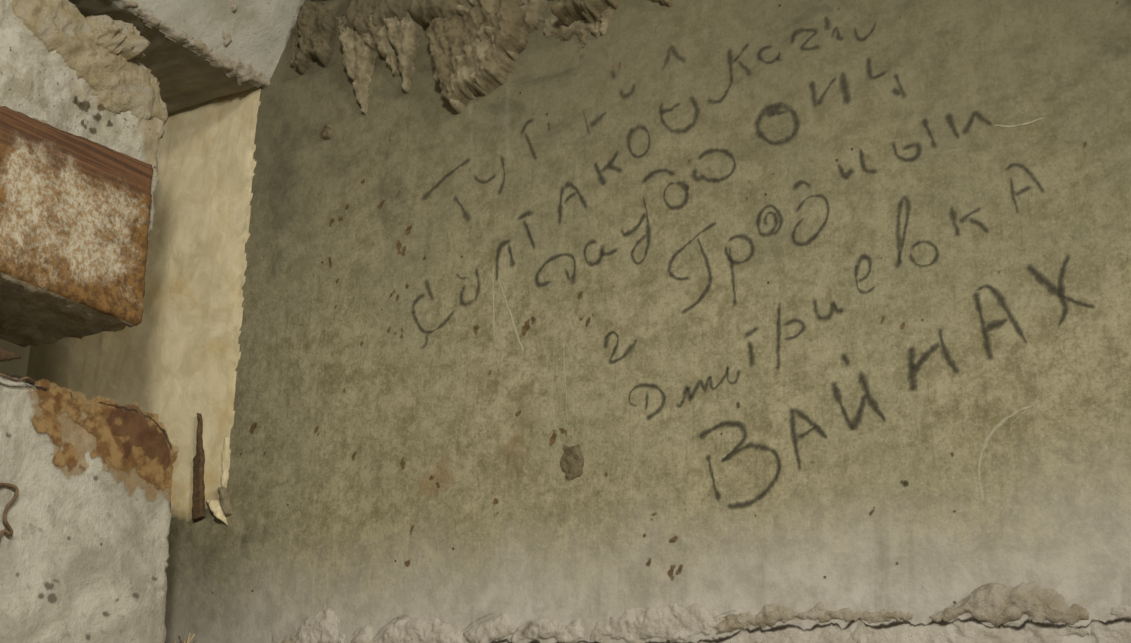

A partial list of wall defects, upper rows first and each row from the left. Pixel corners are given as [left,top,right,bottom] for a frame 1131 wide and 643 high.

spalling [290,0,619,115]
corrosion [29,379,206,520]
crack [490,623,601,643]
crack [645,617,1131,643]